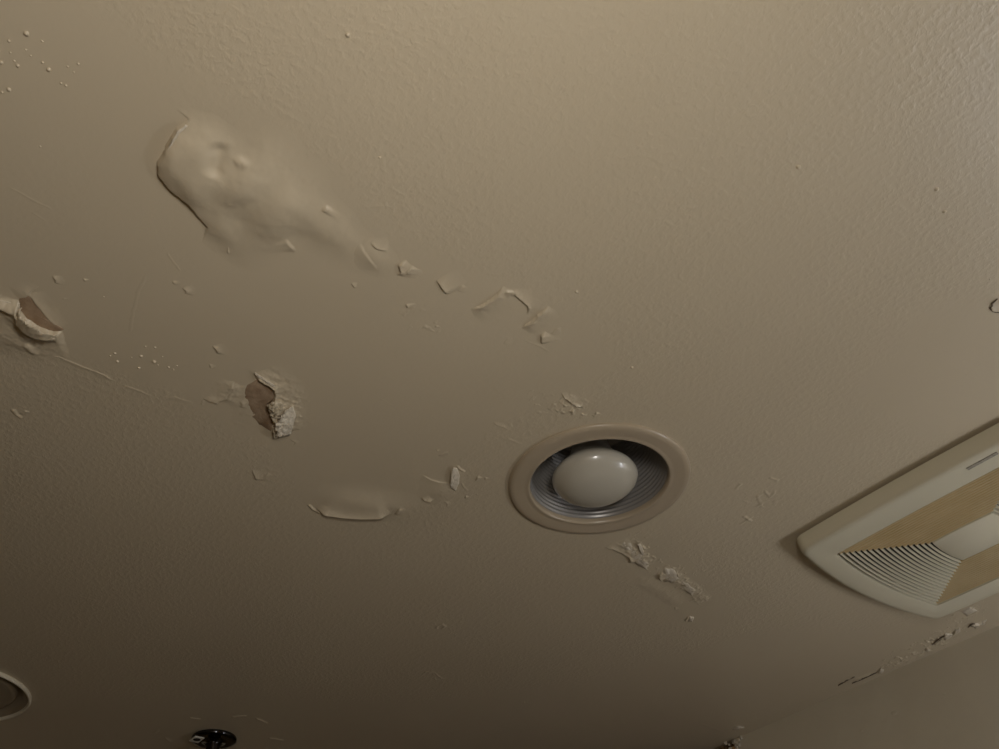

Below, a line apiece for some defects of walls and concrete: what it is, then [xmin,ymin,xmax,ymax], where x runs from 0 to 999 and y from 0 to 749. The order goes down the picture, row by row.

peeling [0,281,70,363]
peeling [203,364,314,446]